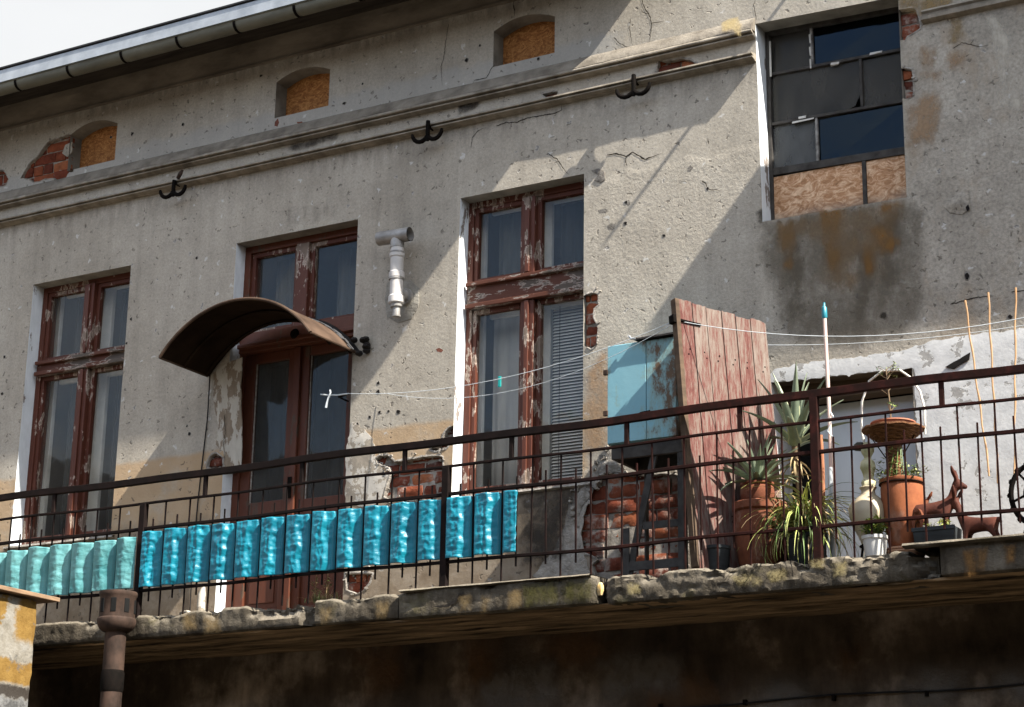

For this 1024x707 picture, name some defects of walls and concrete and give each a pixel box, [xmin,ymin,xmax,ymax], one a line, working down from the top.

flaking render [900,6,922,41]
flaking render [903,65,918,100]
crack [471,107,562,144]
flaking render [0,133,75,187]
crack [607,152,662,165]
leakage [768,207,918,342]
flaking render [205,357,243,469]
flaking render [345,409,454,507]
flaking render [568,445,690,579]